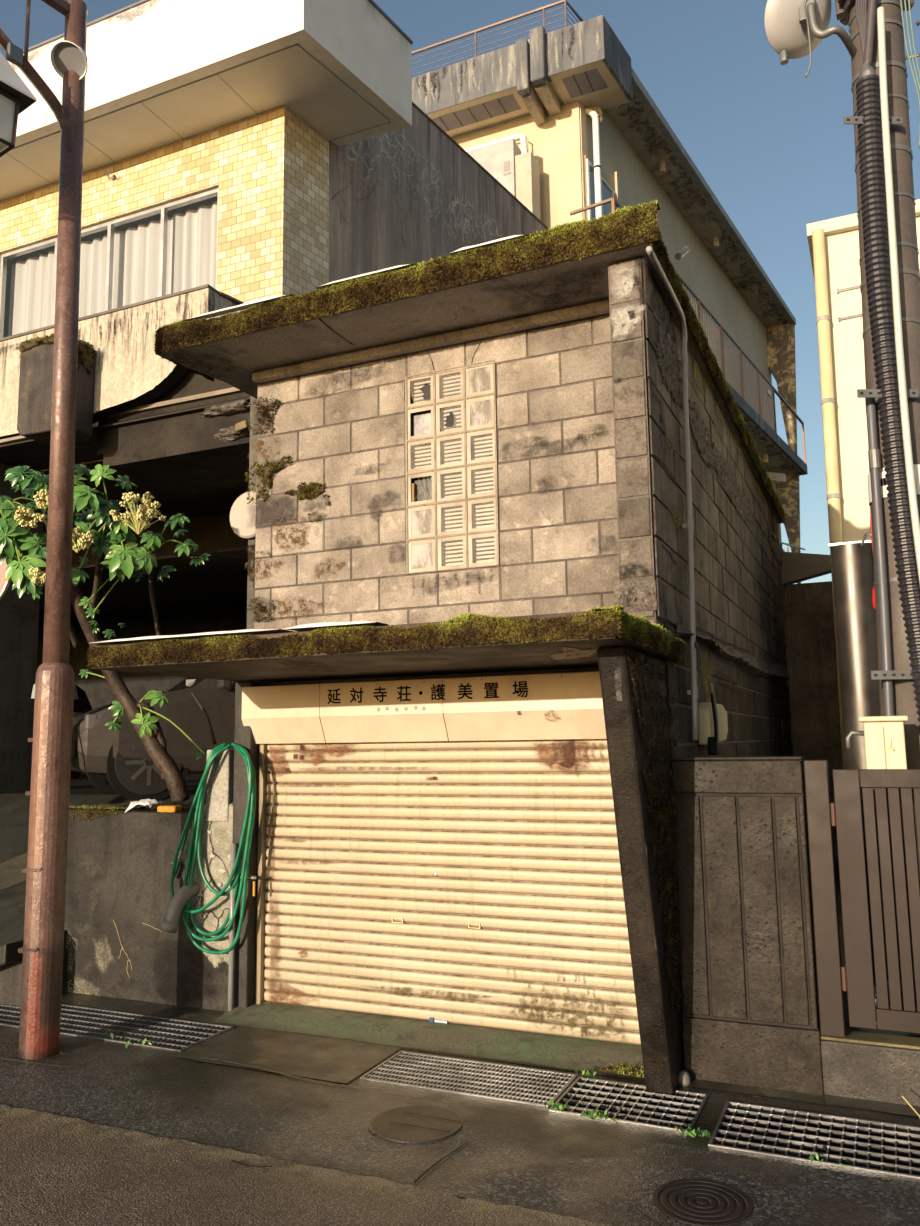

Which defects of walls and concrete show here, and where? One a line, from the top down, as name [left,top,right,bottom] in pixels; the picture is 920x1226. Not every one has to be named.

spalling [200,400,250,442]
water stain [250,497,320,525]
rust [270,743,372,787]
rust [537,739,603,773]
rust [269,981,303,1005]